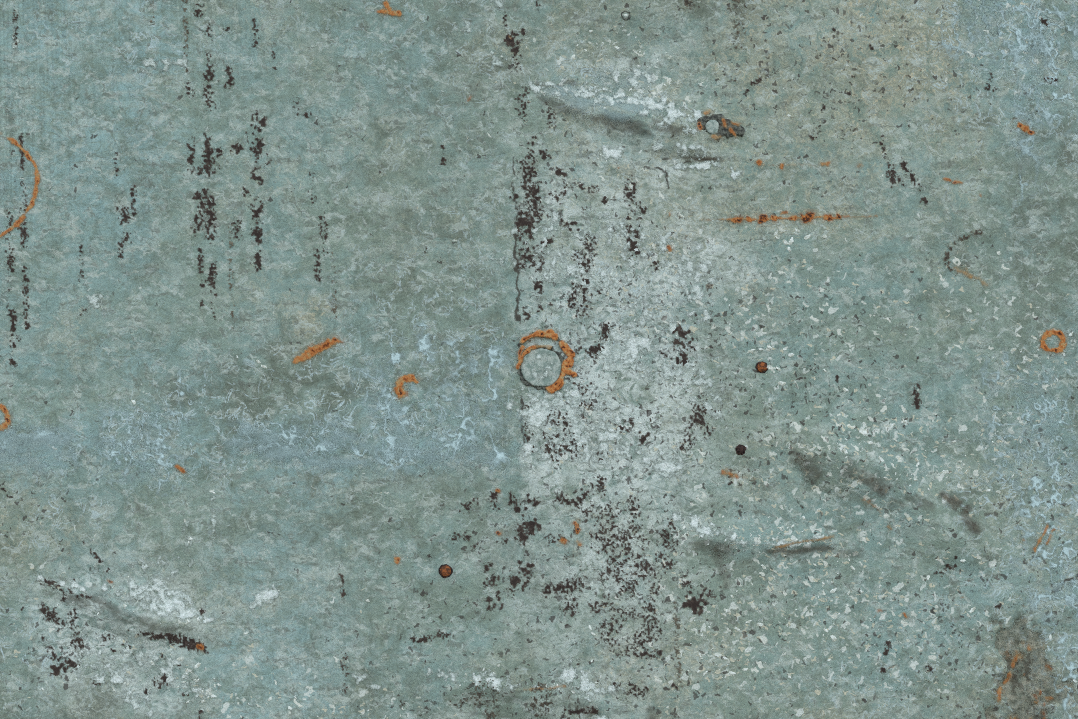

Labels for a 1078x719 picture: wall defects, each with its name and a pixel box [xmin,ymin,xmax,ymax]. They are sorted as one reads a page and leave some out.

leakage [4,133,31,365]
corrosion [0,138,40,237]
leakage [186,110,279,320]
leakage [509,136,609,320]
corrosion [721,211,841,224]
corrosion [293,337,341,364]
corrosion [516,329,577,394]
leakage [659,324,697,366]
corrosion [1040,329,1067,353]
corrosion [0,404,11,430]
leakage [524,410,586,465]
leakage [459,474,711,691]